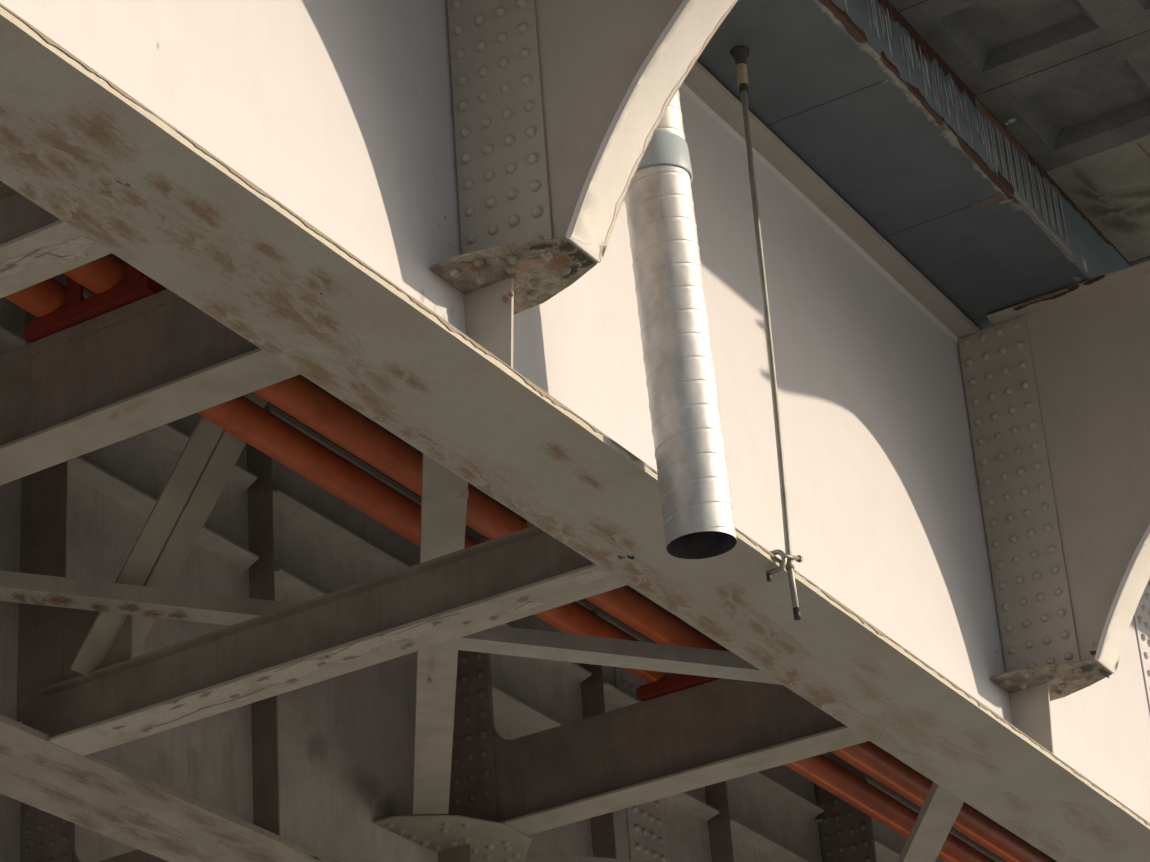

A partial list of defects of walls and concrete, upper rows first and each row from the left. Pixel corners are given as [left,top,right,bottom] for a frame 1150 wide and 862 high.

leakage [867,0,1089,283]
corrosion [0,97,228,262]
corrosion [1013,273,1107,311]
corrosion [192,248,1004,787]
corrosion [0,591,191,620]
corrosion [1049,640,1111,694]
corrosion [0,744,127,809]
corrosion [1003,793,1082,862]